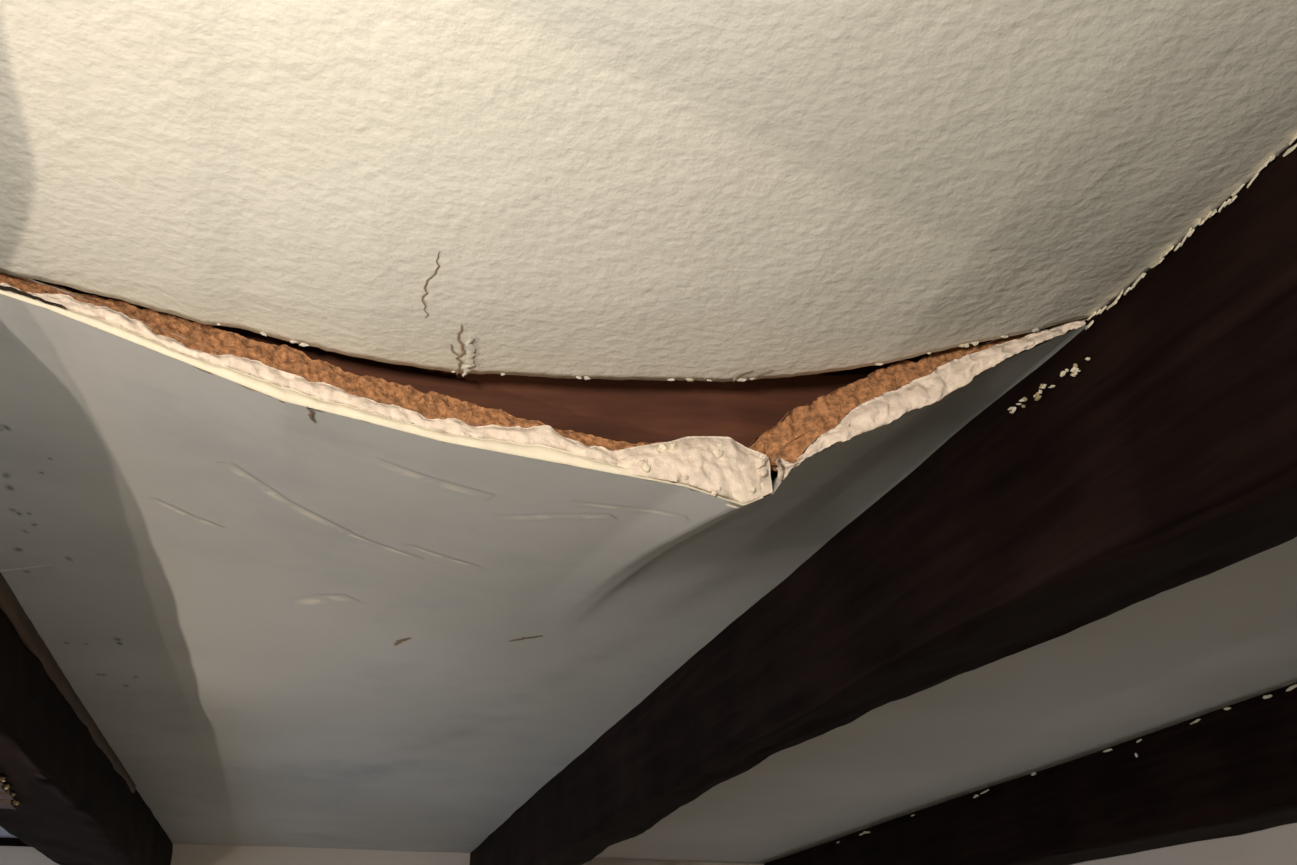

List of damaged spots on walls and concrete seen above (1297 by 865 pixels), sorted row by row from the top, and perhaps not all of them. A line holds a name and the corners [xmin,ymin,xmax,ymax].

crack [421,251,440,318]
crack [450,323,476,377]
flaking render [0,133,1297,508]